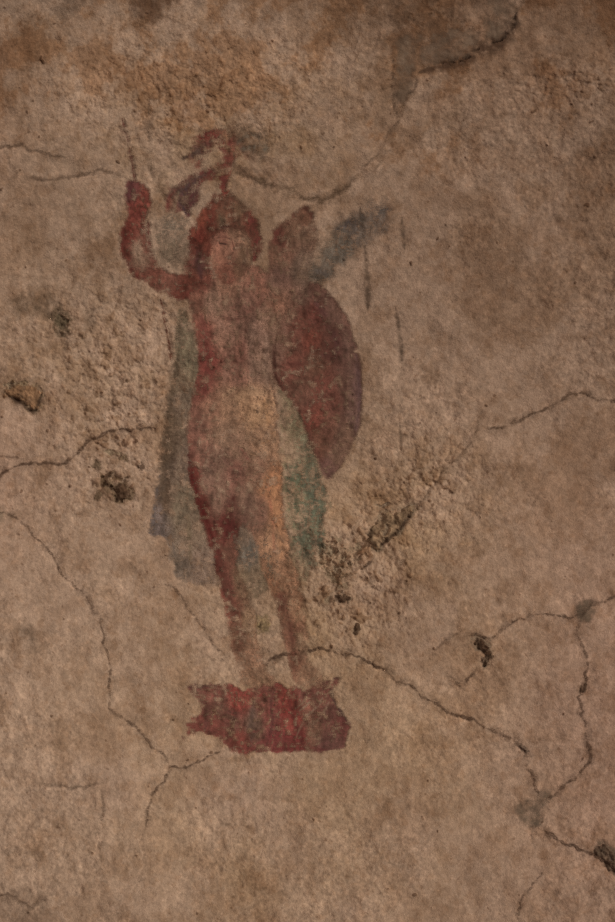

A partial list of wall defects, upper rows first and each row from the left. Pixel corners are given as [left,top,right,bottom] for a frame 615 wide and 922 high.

spalling [3,379,44,412]
crack [0,427,151,477]
spalling [91,449,134,504]
spalling [471,635,494,669]
crack [269,646,526,752]
crack [533,645,592,793]
crack [120,716,219,826]
crack [546,831,615,870]